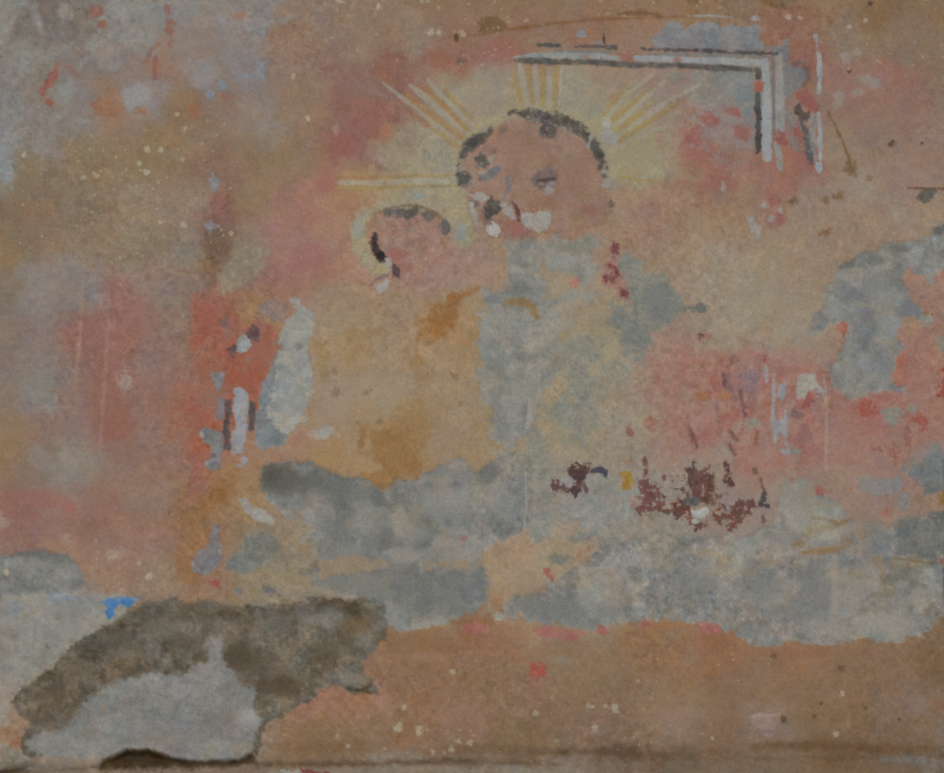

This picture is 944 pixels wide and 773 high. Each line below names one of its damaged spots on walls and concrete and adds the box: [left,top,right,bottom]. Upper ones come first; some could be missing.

flaking render [0,191,944,773]